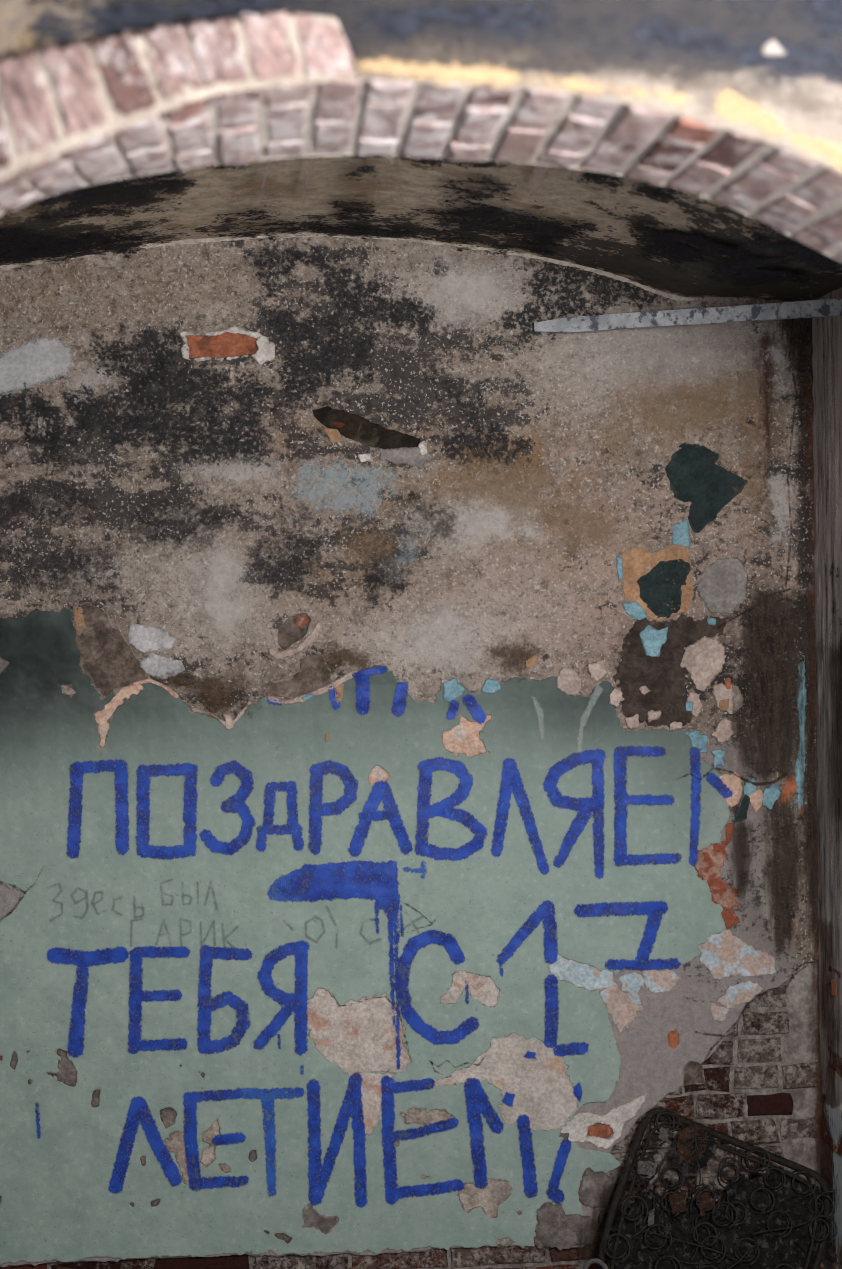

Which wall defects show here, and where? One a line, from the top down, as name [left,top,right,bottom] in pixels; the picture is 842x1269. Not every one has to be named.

flaking render [179,327,275,386]
damp [175,455,280,489]
damp [454,499,545,549]
damp [759,318,812,540]
damp [186,545,250,632]
spalling [73,602,178,747]
spalling [557,443,807,1022]
damp [732,591,842,952]
peeling [548,954,680,1033]
peeling [306,988,410,1134]
peeling [433,1033,647,1150]
spalling [517,1168,618,1251]